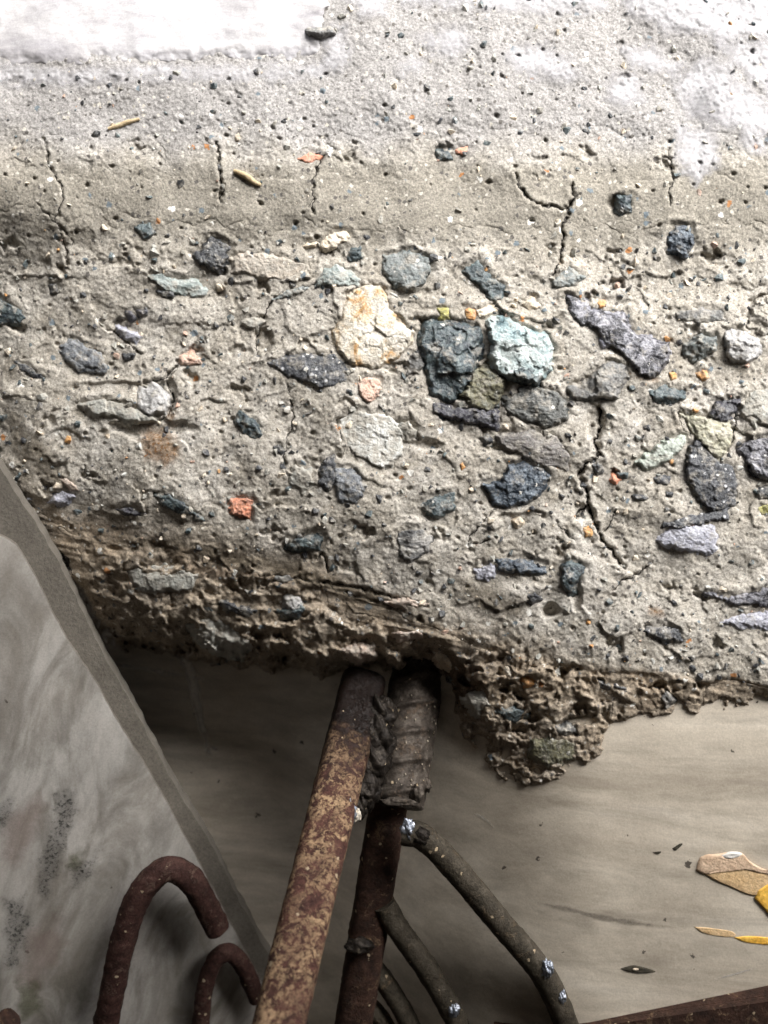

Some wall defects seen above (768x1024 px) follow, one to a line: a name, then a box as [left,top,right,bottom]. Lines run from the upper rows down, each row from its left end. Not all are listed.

spalling [462,0,496,15]
crack [40,139,74,265]
crack [205,139,225,203]
crack [516,175,582,276]
spalling [0,21,768,811]
crack [556,407,650,589]